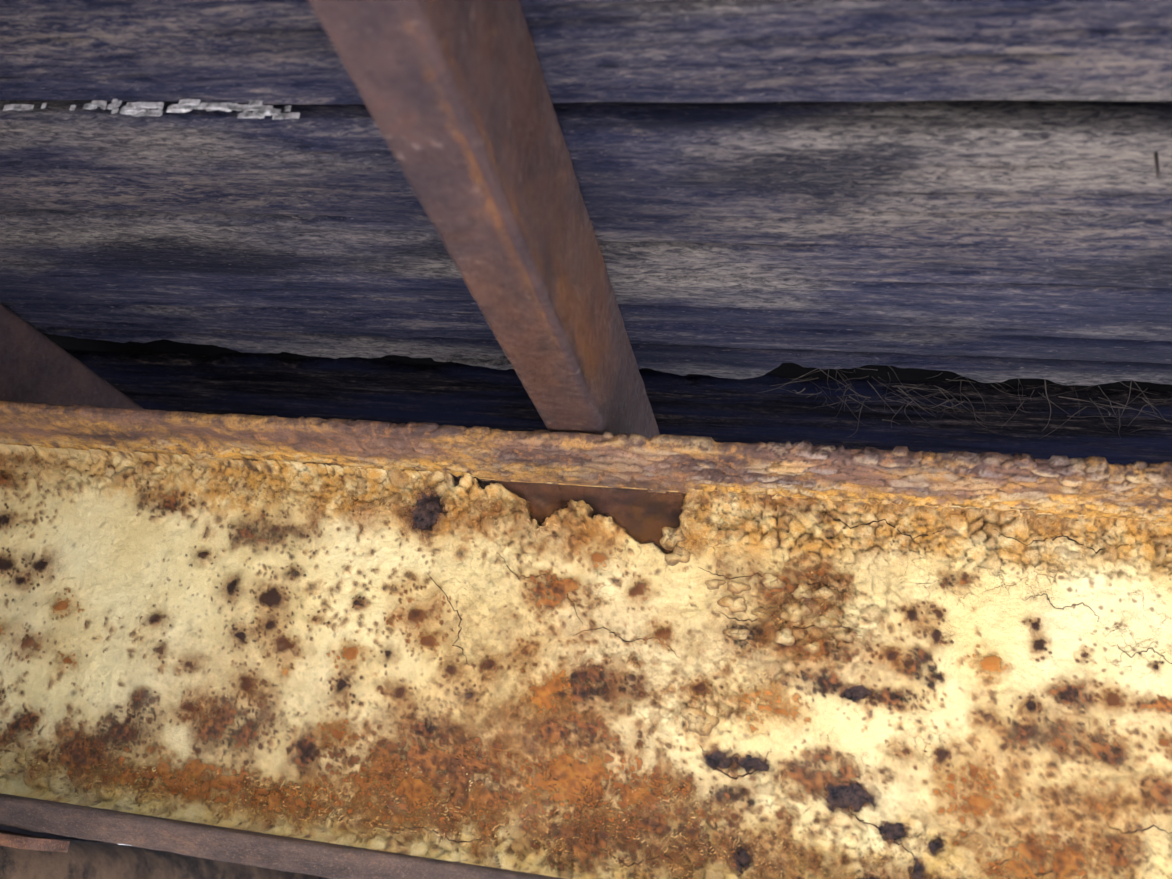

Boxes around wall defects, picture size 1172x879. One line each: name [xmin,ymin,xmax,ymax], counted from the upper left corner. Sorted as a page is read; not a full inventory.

spalling [404,488,447,537]
peeling [450,473,686,554]
crack [819,512,945,542]
crack [994,529,1136,554]
rust [0,548,54,601]
crack [698,567,763,579]
rust [938,566,980,593]
crack [719,611,861,636]
rust [1022,618,1052,662]
crack [1023,593,1172,664]
rust [30,499,954,879]
rust [885,680,1172,879]